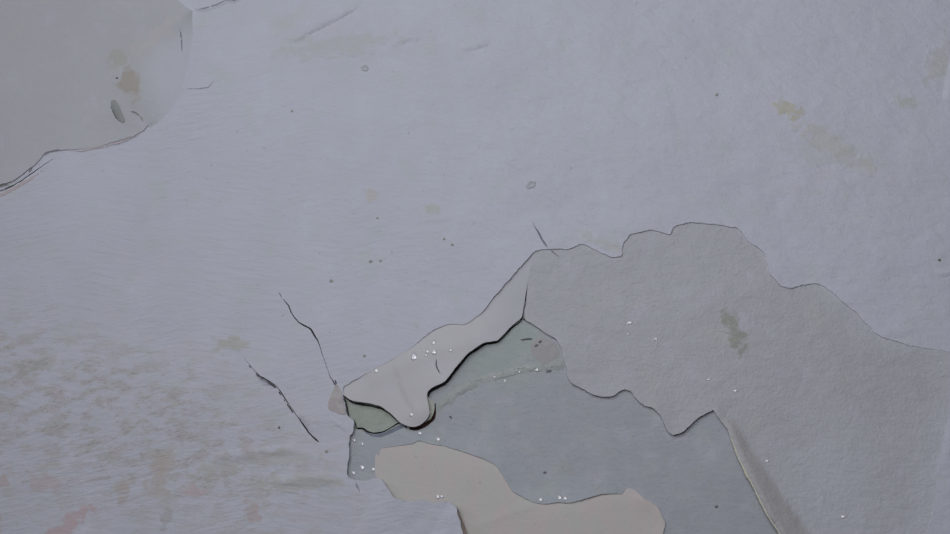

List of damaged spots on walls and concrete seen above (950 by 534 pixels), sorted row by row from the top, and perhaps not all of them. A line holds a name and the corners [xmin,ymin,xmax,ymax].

crack [249,366,319,442]
crack [279,293,337,385]
peeling [328,222,950,534]